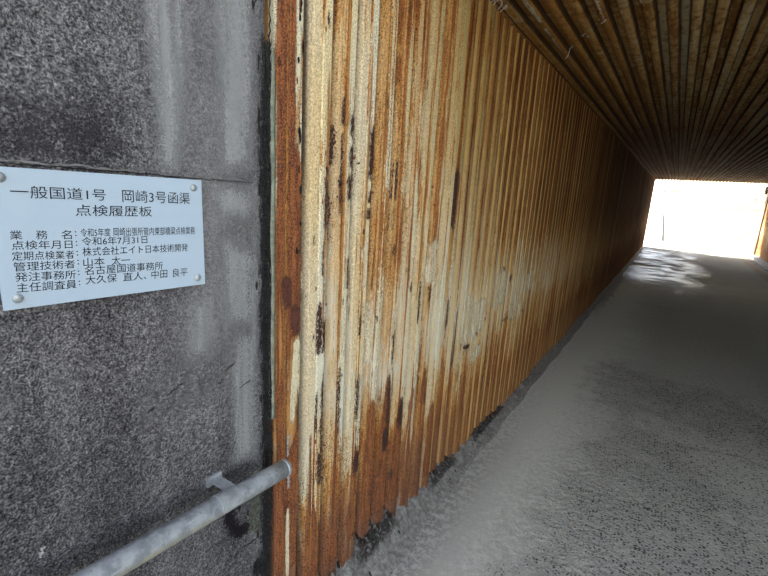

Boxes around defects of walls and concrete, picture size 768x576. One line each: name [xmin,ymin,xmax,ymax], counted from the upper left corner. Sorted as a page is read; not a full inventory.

rust [274,0,434,576]